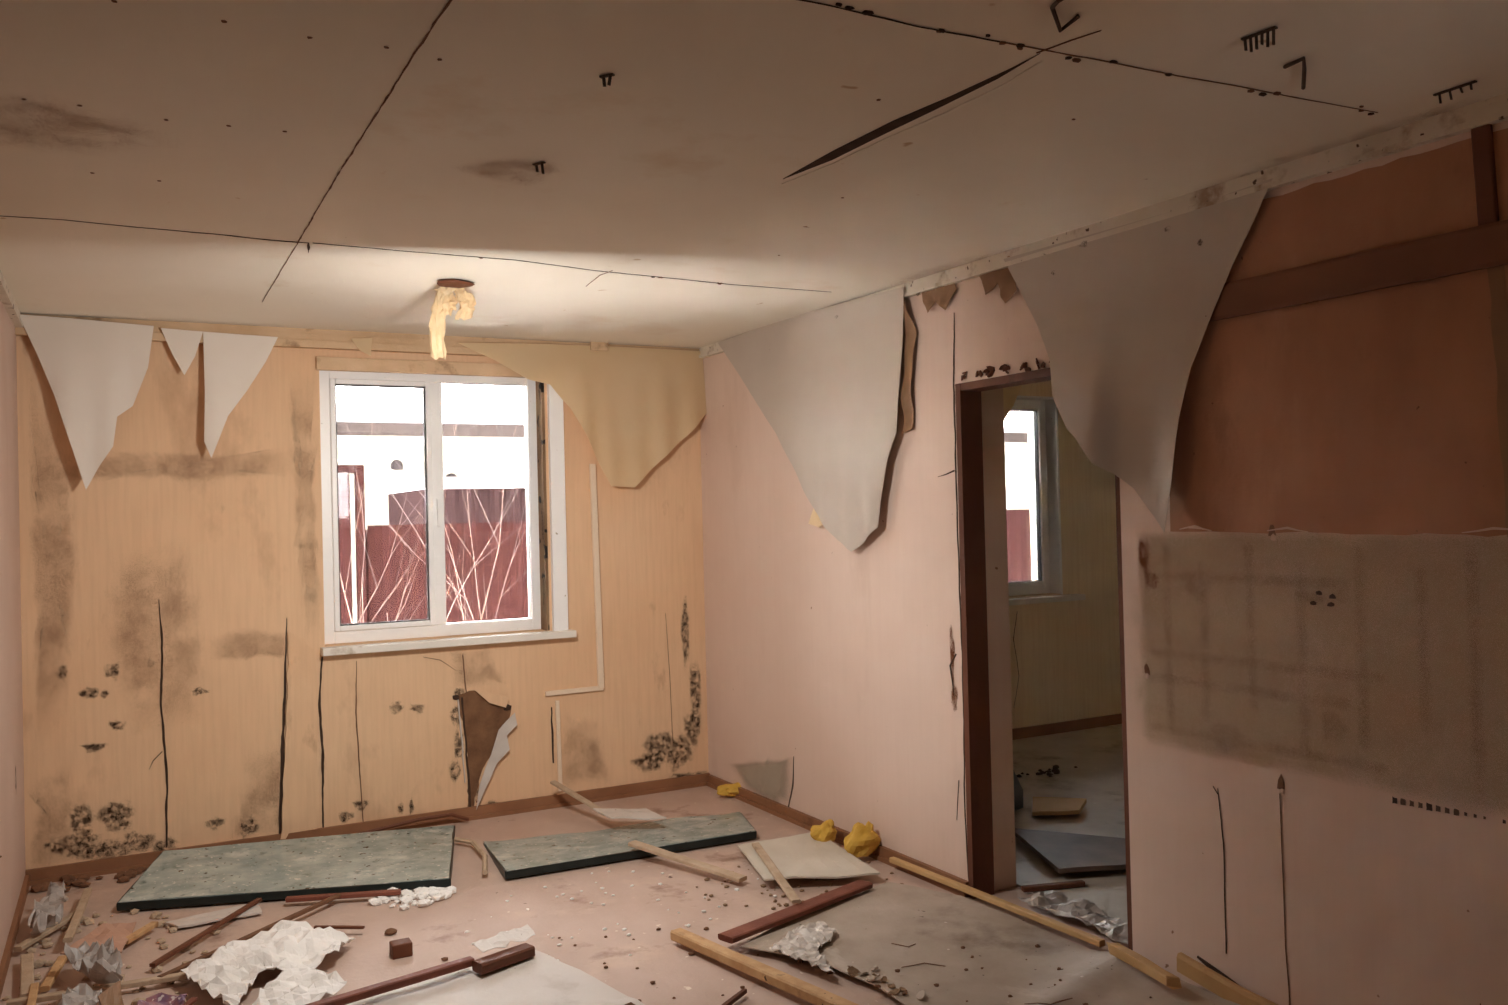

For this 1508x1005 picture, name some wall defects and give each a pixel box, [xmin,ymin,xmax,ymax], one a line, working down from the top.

crack [3,0,827,302]
crack [782,0,1378,184]
water stain [15,768,177,867]
crack [149,600,168,847]
peeling [452,695,466,783]
mould [630,597,705,778]
crack [1213,786,1227,954]
crack [1279,793,1291,1005]